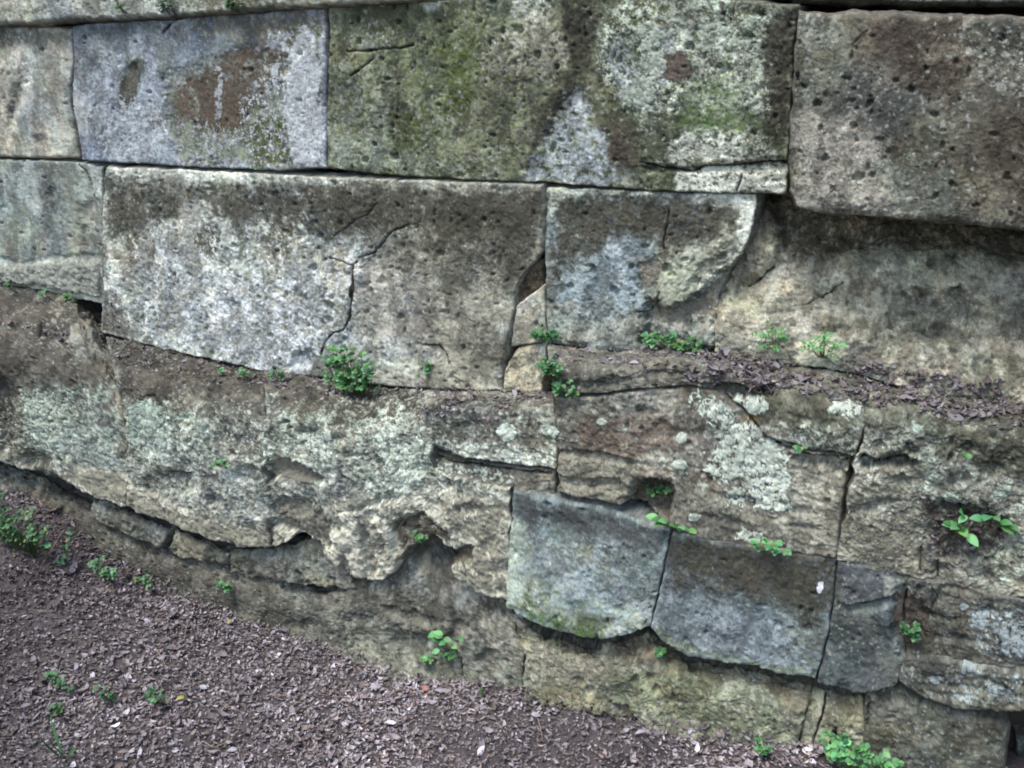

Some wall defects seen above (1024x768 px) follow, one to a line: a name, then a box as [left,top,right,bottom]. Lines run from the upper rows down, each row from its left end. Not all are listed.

crack [320,207,418,355]
crack [813,692,837,744]